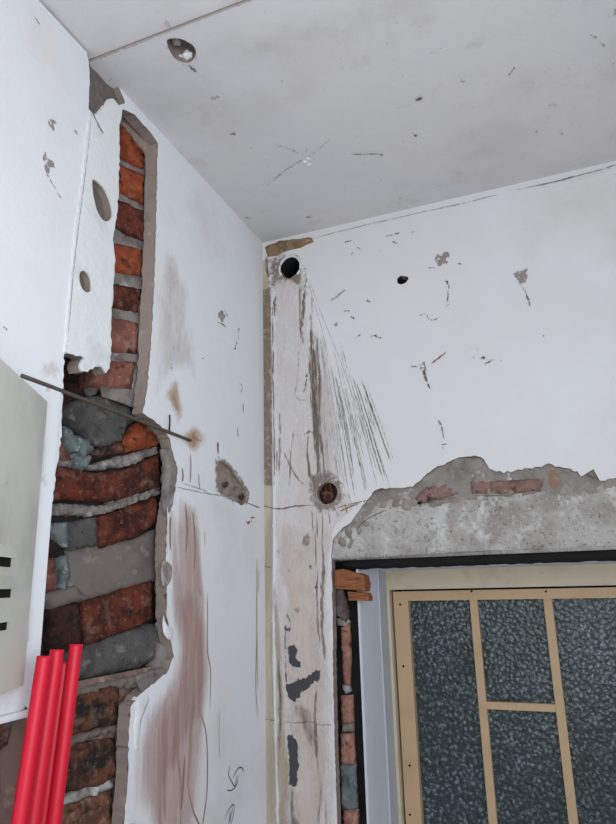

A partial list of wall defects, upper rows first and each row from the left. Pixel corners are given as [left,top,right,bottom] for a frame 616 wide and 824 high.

flaking render [89,65,118,112]
peeling [429,252,449,269]
peeling [514,269,530,306]
water stain [310,286,390,512]
spalling [40,117,178,824]
spalling [215,442,249,504]
flaking render [246,261,320,824]
spalling [338,457,616,548]
water stain [145,503,211,824]
flaking render [0,718,27,824]